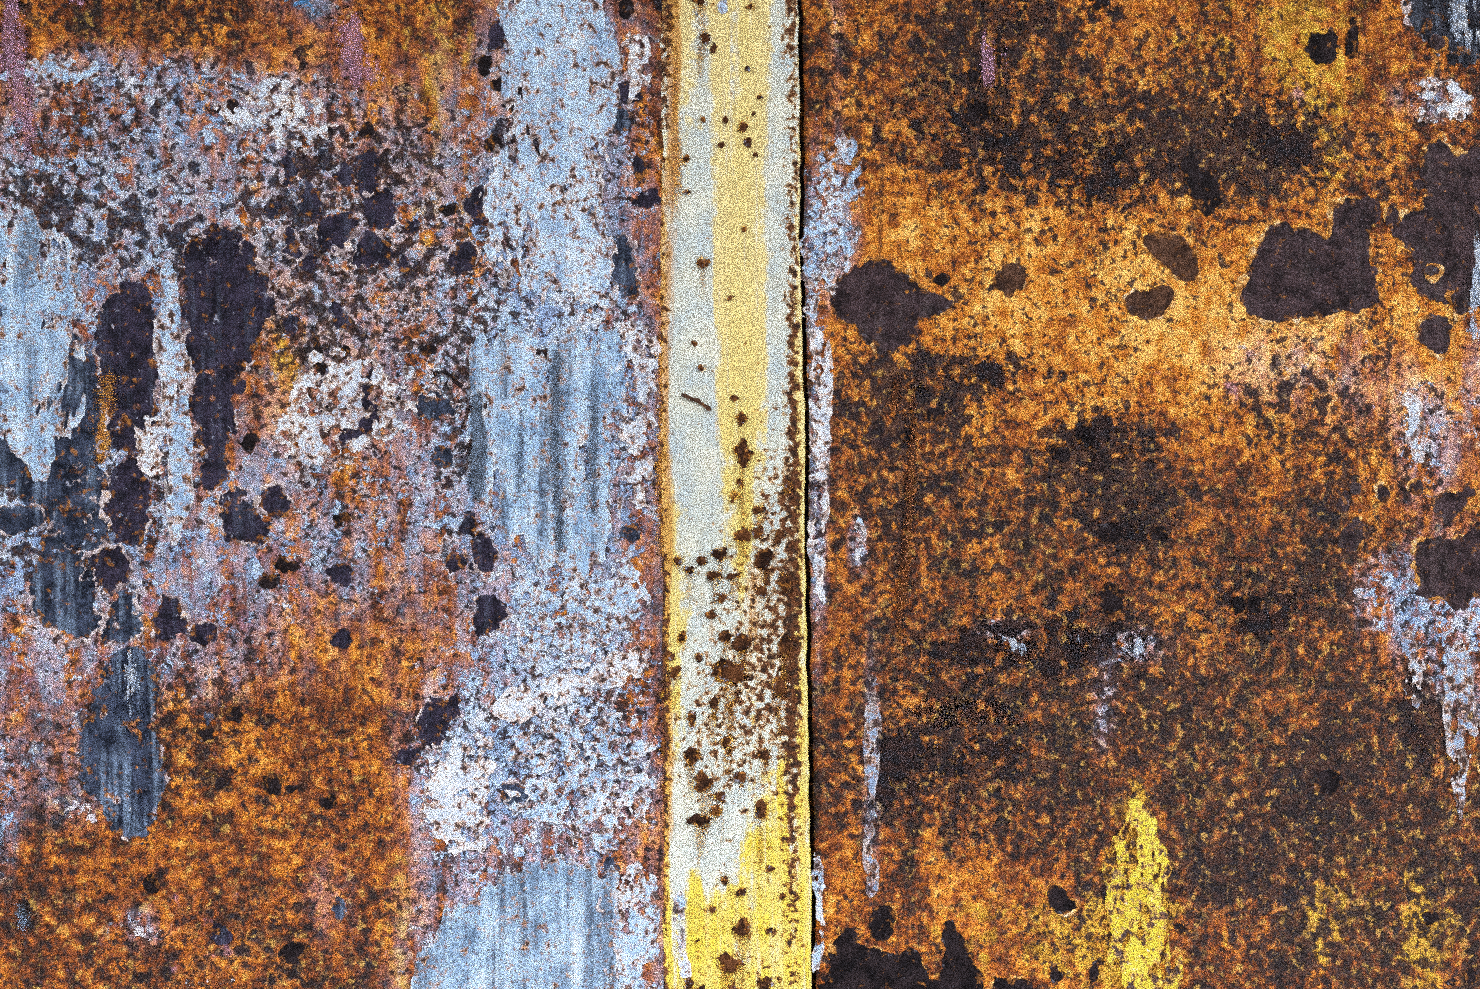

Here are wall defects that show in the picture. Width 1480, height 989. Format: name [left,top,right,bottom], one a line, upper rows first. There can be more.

rust [701,95,763,157]
rust [906,101,1155,211]
peeling [1236,0,1480,361]
peeling [799,130,954,637]
peeling [0,0,692,989]
rust [655,337,792,827]
rust [923,604,1124,703]
peeling [1336,392,1480,611]
rust [732,917,773,941]
peeling [811,705,1033,989]
rust [863,725,1026,814]
peeling [1089,796,1186,989]